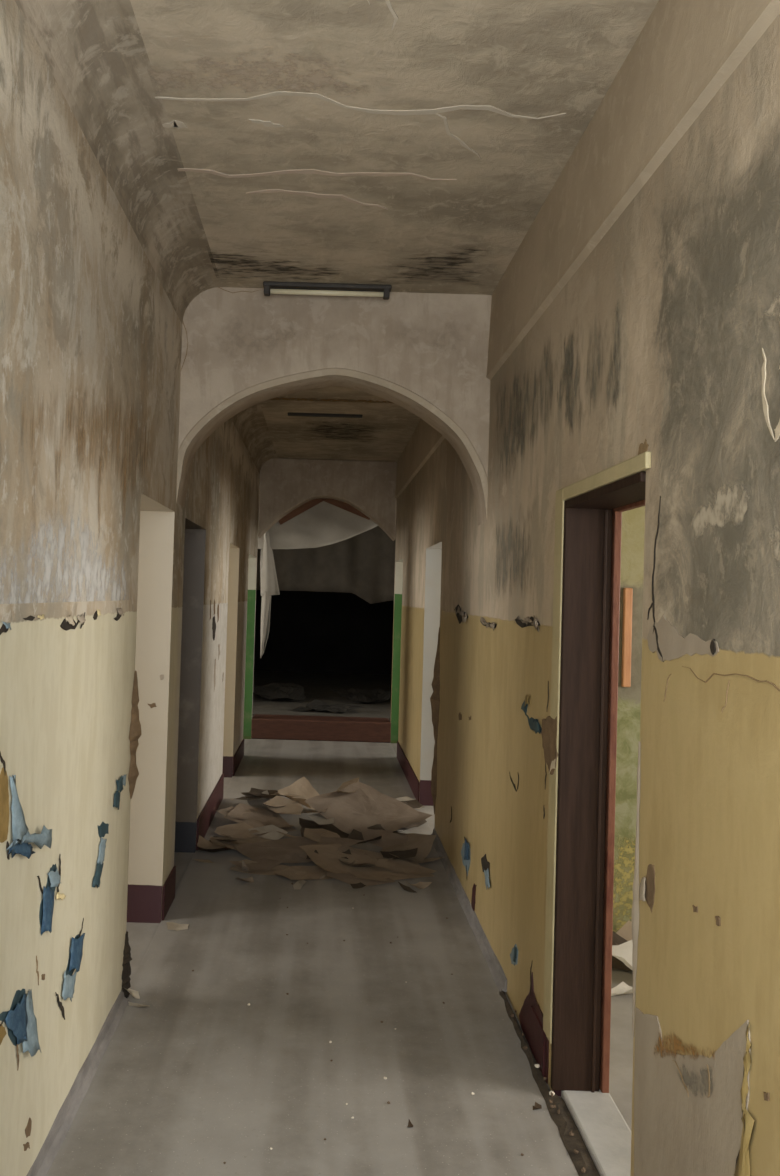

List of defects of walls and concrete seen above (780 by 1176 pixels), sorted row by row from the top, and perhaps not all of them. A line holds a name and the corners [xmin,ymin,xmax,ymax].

water stain [209,252,335,279]
water stain [501,328,620,465]
flaking render [762,348,780,442]
water stain [68,408,148,518]
efflorescence [0,520,126,604]
crack [647,496,780,712]
spalling [113,671,157,809]
peeling [0,752,66,935]
peeling [92,822,109,888]
peeling [55,918,85,1020]
peeling [631,741,770,1176]
peeling [0,989,41,1071]